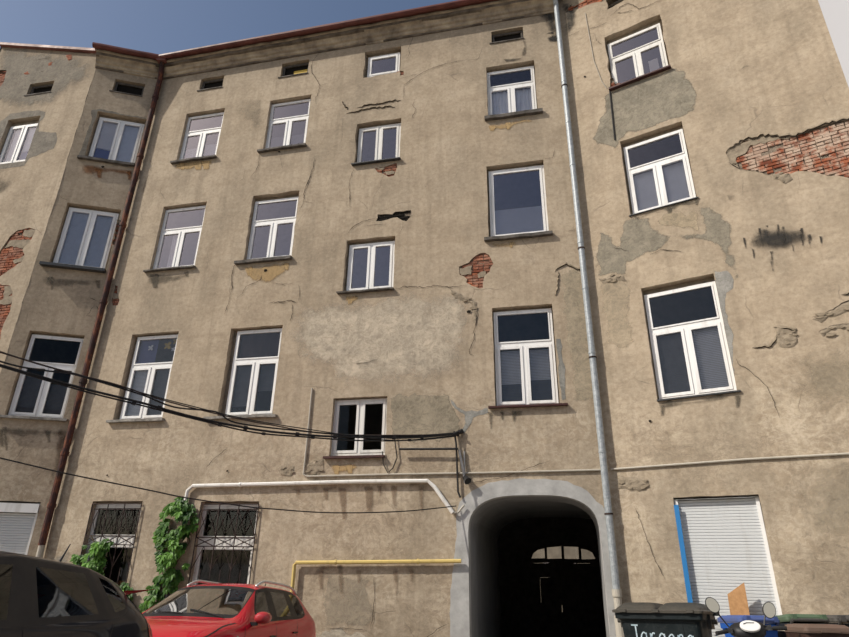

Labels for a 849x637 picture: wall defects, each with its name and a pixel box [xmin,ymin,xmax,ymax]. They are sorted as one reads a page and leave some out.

spalling [568,0,604,11]
crack [342,38,474,117]
spalling [375,163,397,177]
spalling [727,121,849,184]
spalling [377,211,412,221]
spalling [0,228,35,338]
spalling [459,253,493,288]
peeling [450,289,478,324]
peeling [813,301,849,336]
peeling [774,326,798,348]